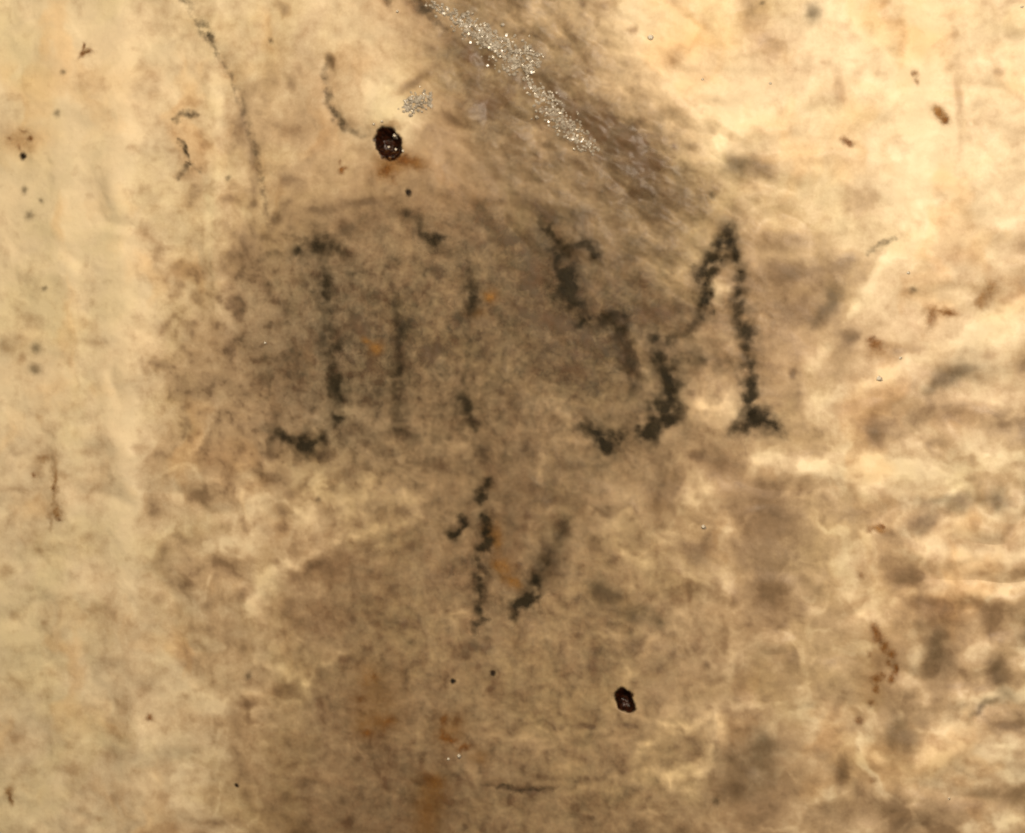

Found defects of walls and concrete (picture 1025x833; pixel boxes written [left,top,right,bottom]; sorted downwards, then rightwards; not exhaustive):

damp [443,0,703,233]
damp [315,482,652,833]
corrosion [872,626,898,692]